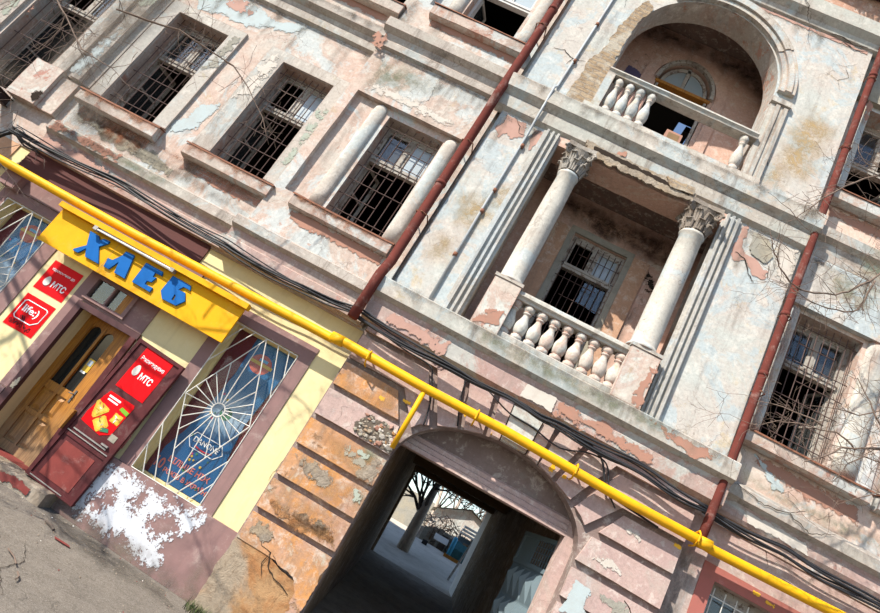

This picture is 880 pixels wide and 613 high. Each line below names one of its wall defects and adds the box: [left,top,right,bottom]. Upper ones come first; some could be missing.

flaking render [197,0,308,33]
flaking render [566,1,654,102]
flaking render [495,113,543,151]
flaking render [731,226,799,284]
peeling [386,313,451,355]
spalling [295,453,333,488]
spalling [344,413,397,504]
peeling [520,384,657,466]
peeling [650,419,713,460]
peeling [72,463,207,570]
crack [261,542,288,595]